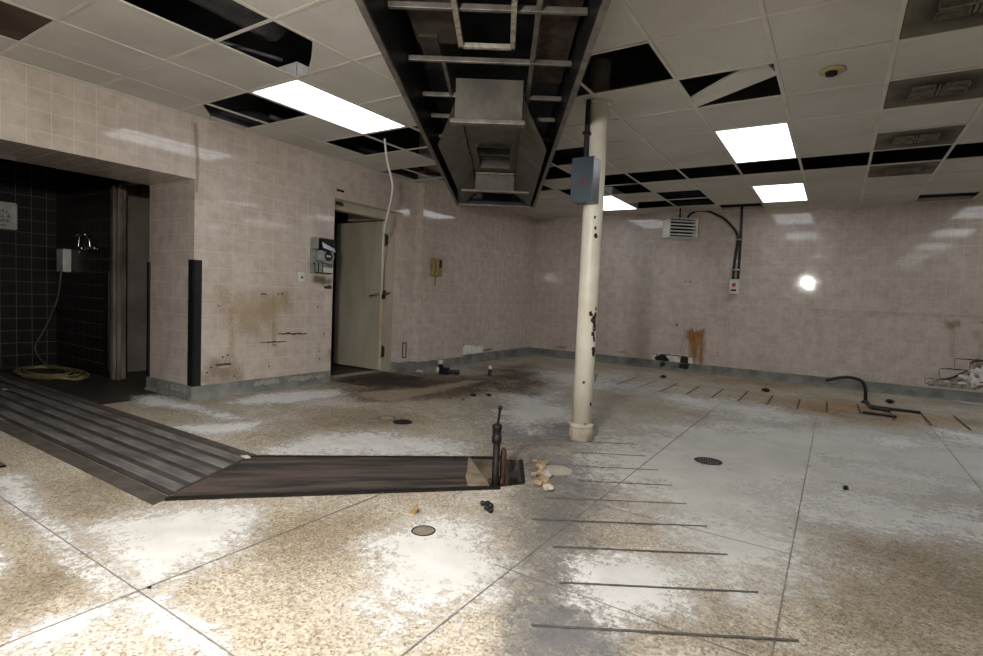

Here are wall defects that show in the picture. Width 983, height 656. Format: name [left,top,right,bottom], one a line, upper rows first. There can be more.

peeling [589,307,597,357]
rust [688,329,704,361]
spalling [926,358,983,390]
leakage [131,366,983,656]
leakage [0,472,267,656]